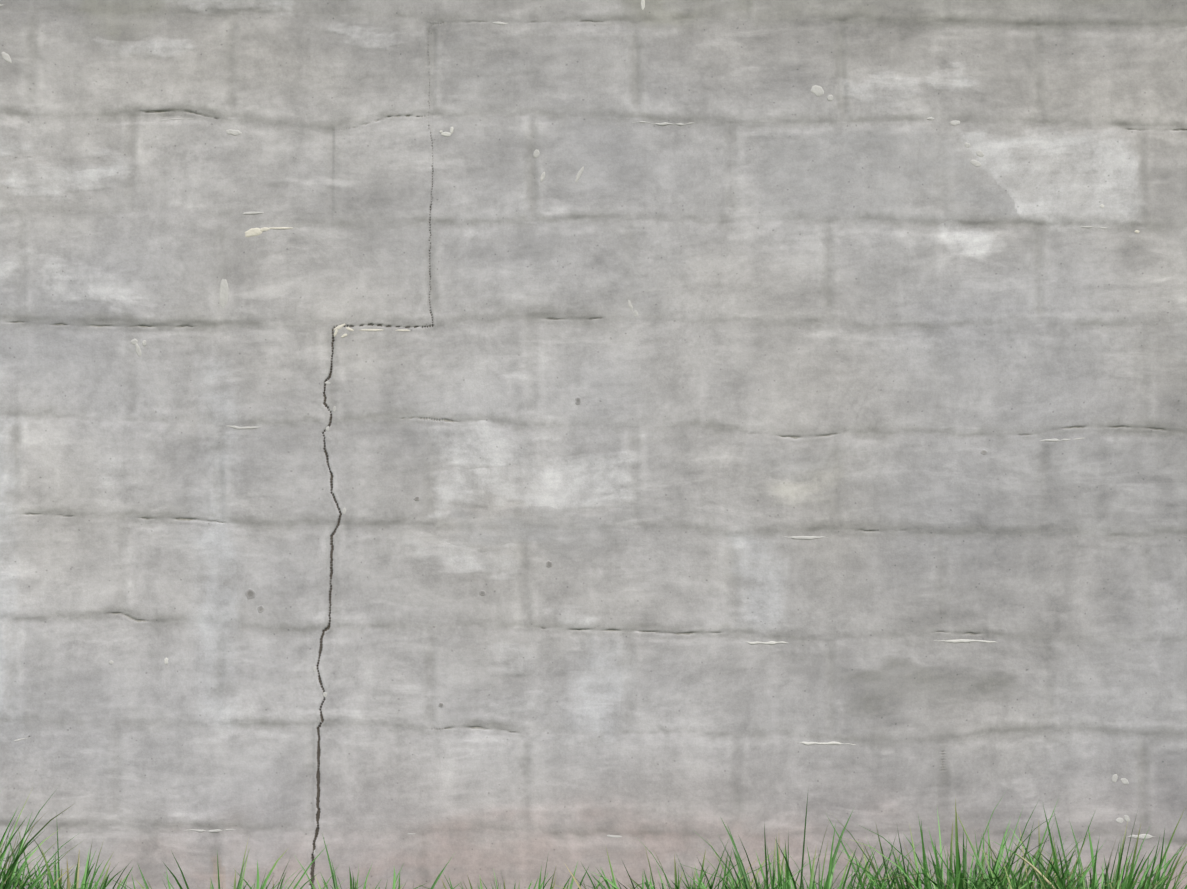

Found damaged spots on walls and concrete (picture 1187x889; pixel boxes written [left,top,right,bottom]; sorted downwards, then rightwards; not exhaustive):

crack [309,85,433,889]
crack [577,628,693,636]